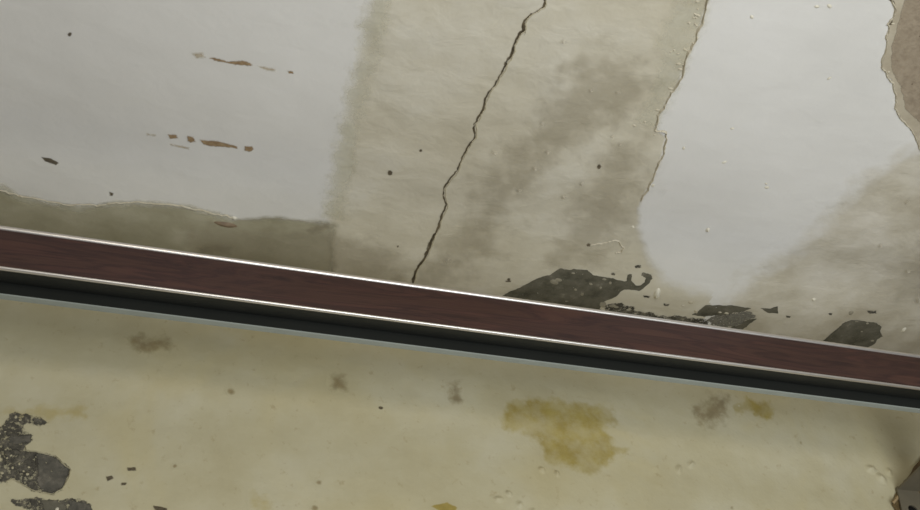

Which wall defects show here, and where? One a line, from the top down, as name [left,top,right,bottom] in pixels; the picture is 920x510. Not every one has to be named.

peeling [881,0,920,150]
corrosion [169,135,253,151]
leakage [0,0,920,358]
crack [412,0,547,284]
spalling [503,265,790,330]
spalling [823,311,882,347]
spalling [0,412,92,510]
leakage [495,392,634,482]